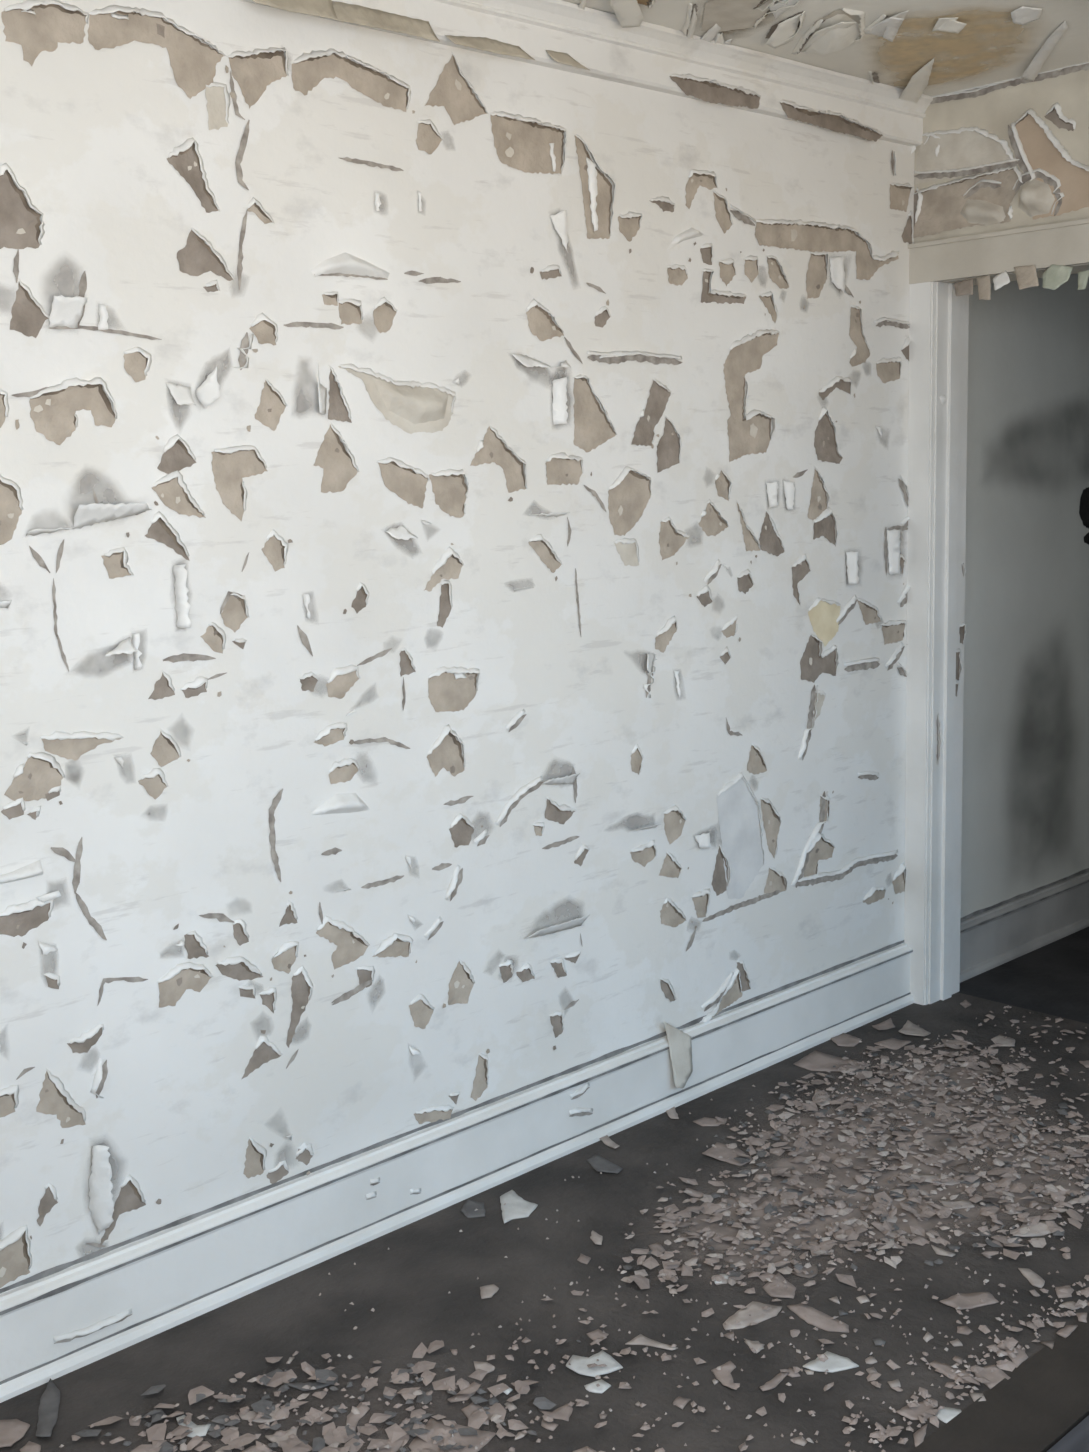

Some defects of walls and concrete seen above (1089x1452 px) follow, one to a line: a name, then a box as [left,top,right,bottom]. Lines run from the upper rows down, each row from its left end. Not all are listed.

peeling [0,0,1089,683]
spalling [148,670,226,700]
peeling [299,648,480,784]
peeling [1,731,124,820]
peeling [138,729,190,799]
peeling [0,890,61,955]
peeling [157,891,313,1079]
peeling [316,902,417,988]
peeling [409,959,475,1029]
peeling [0,1067,86,1144]
peeling [0,1182,58,1288]
peeling [86,1143,161,1248]